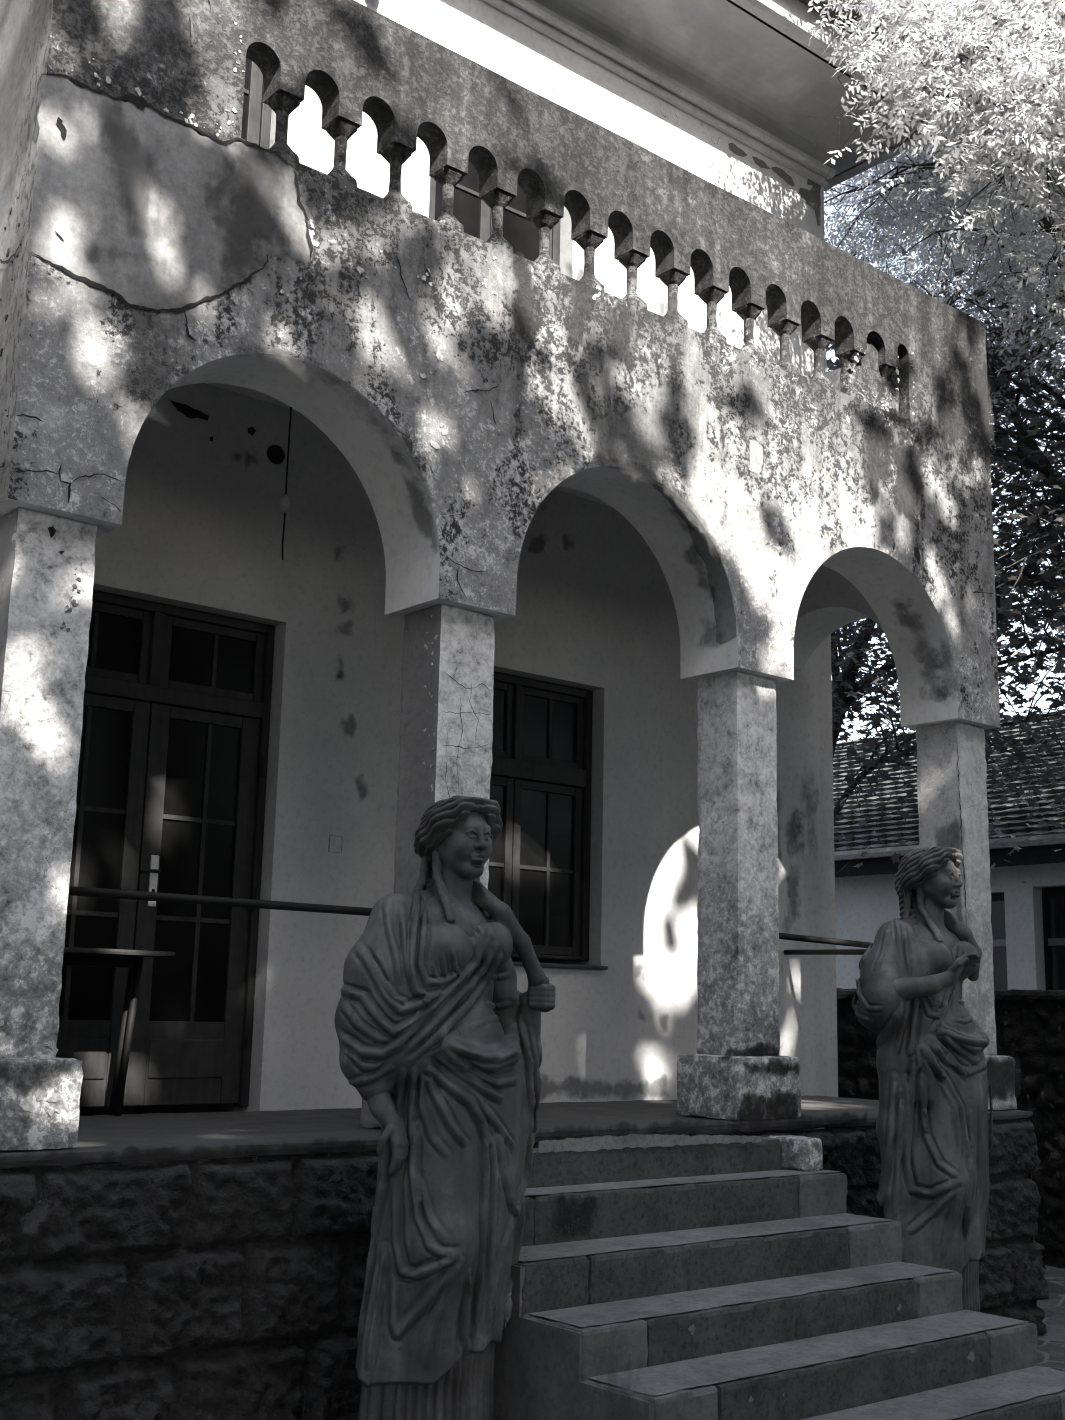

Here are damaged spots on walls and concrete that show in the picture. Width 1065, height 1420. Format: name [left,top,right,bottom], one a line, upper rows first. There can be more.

crack [41,73,313,256]
damp [208,154,285,276]
flaking render [701,121,821,226]
crack [0,245,269,341]
damp [514,253,540,360]
damp [567,264,637,372]
crack [15,463,125,512]
damp [599,404,721,560]
damp [864,417,925,522]
damp [938,361,995,484]
crack [443,672,494,797]
damp [538,1042,867,1140]